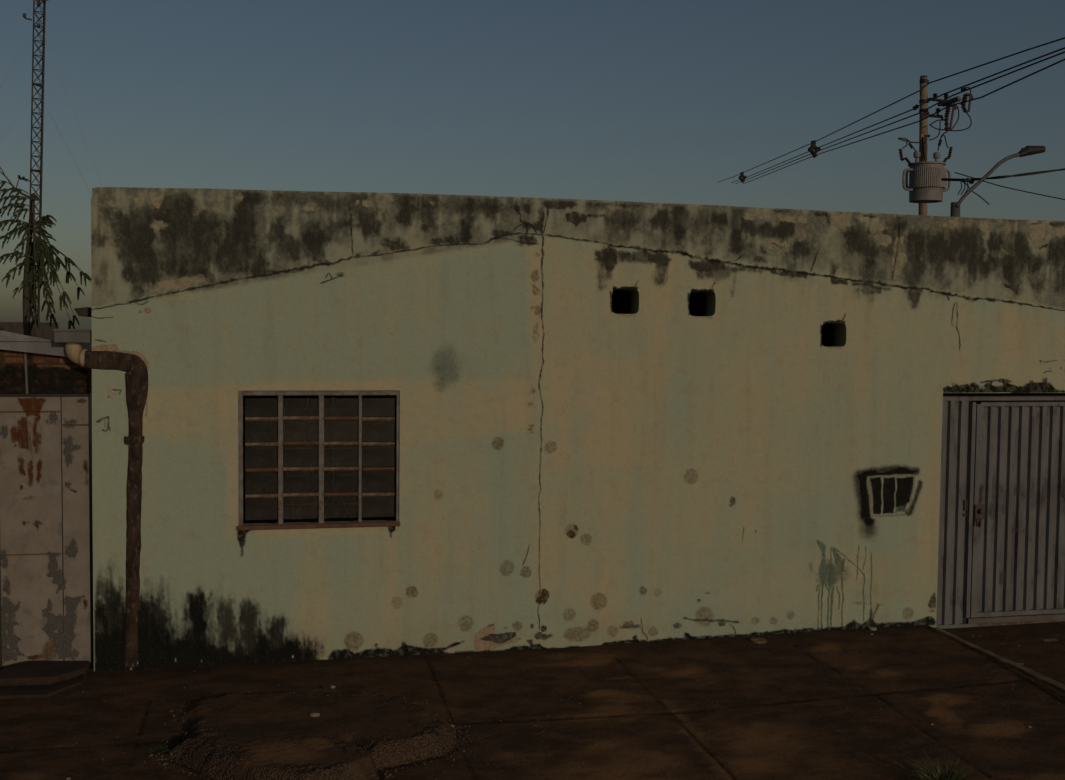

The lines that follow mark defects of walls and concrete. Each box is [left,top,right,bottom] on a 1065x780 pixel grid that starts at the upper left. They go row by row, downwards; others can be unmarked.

damp [105,192,409,289]
damp [396,196,498,244]
damp [493,201,639,244]
damp [831,215,1065,308]
crack [91,204,1065,630]
peeling [0,550,24,663]
peeling [42,540,85,660]
damp [95,586,316,672]
damp [329,642,490,659]
peeling [474,624,521,651]
damp [503,624,551,651]
damp [602,541,936,645]